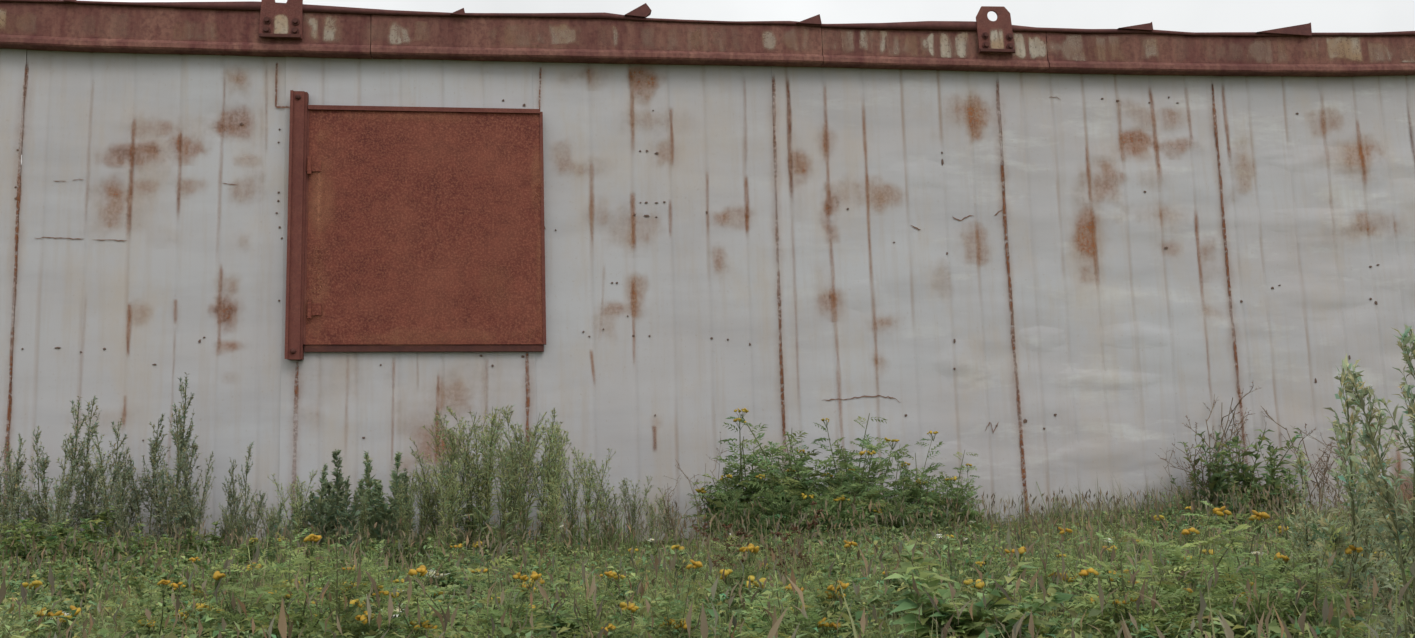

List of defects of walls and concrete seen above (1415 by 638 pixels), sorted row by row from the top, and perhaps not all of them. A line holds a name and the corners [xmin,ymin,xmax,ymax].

corrosion [109,139,157,217]
corrosion [1119,132,1160,166]
corrosion [1001,161,1015,353]
corrosion [1076,214,1096,256]
corrosion [1017,388,1029,521]